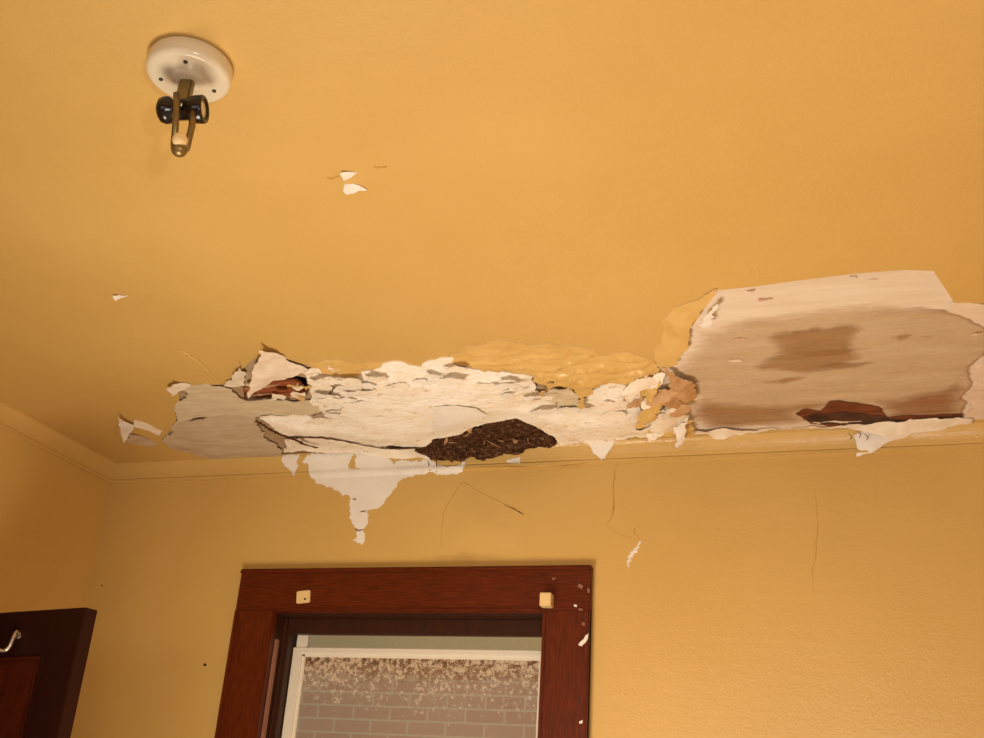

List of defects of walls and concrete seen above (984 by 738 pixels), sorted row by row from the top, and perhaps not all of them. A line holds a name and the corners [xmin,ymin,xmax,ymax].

peeling [327,171,367,195]
flaking render [522,377,585,408]
leakage [765,328,853,392]
flaking render [652,270,984,457]
flaking render [116,350,465,545]
peeling [589,441,614,460]
crack [607,469,641,567]